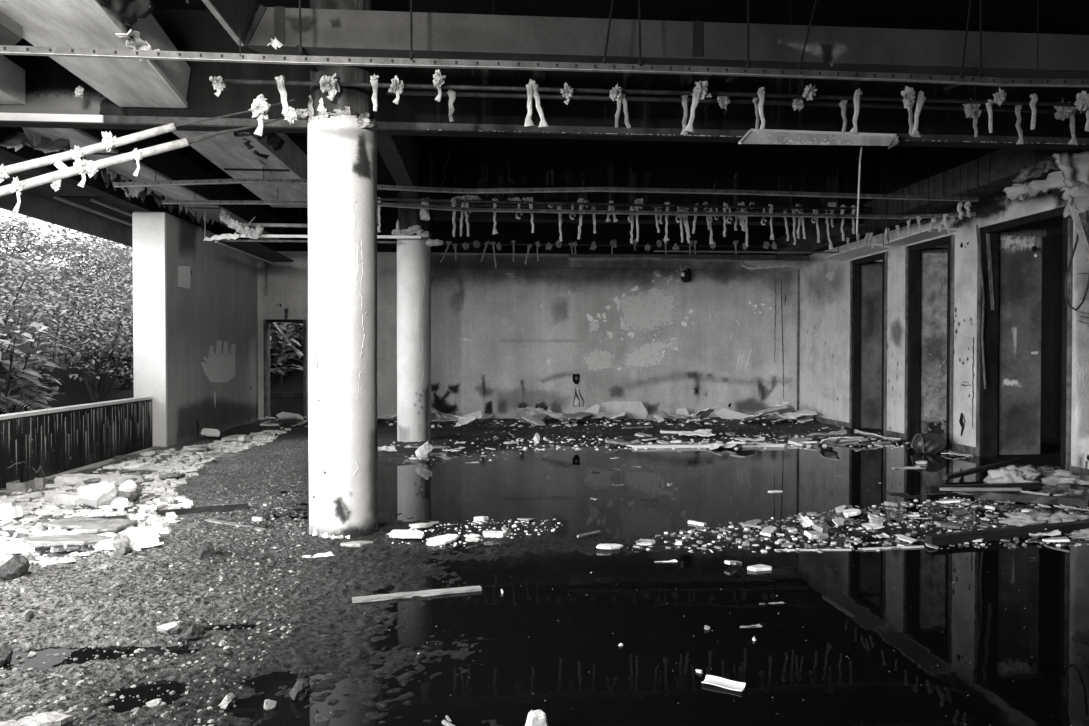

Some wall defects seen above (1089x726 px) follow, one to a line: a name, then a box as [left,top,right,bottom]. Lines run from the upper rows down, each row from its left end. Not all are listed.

peeling [572,264,694,407]
damp [737,400,768,411]